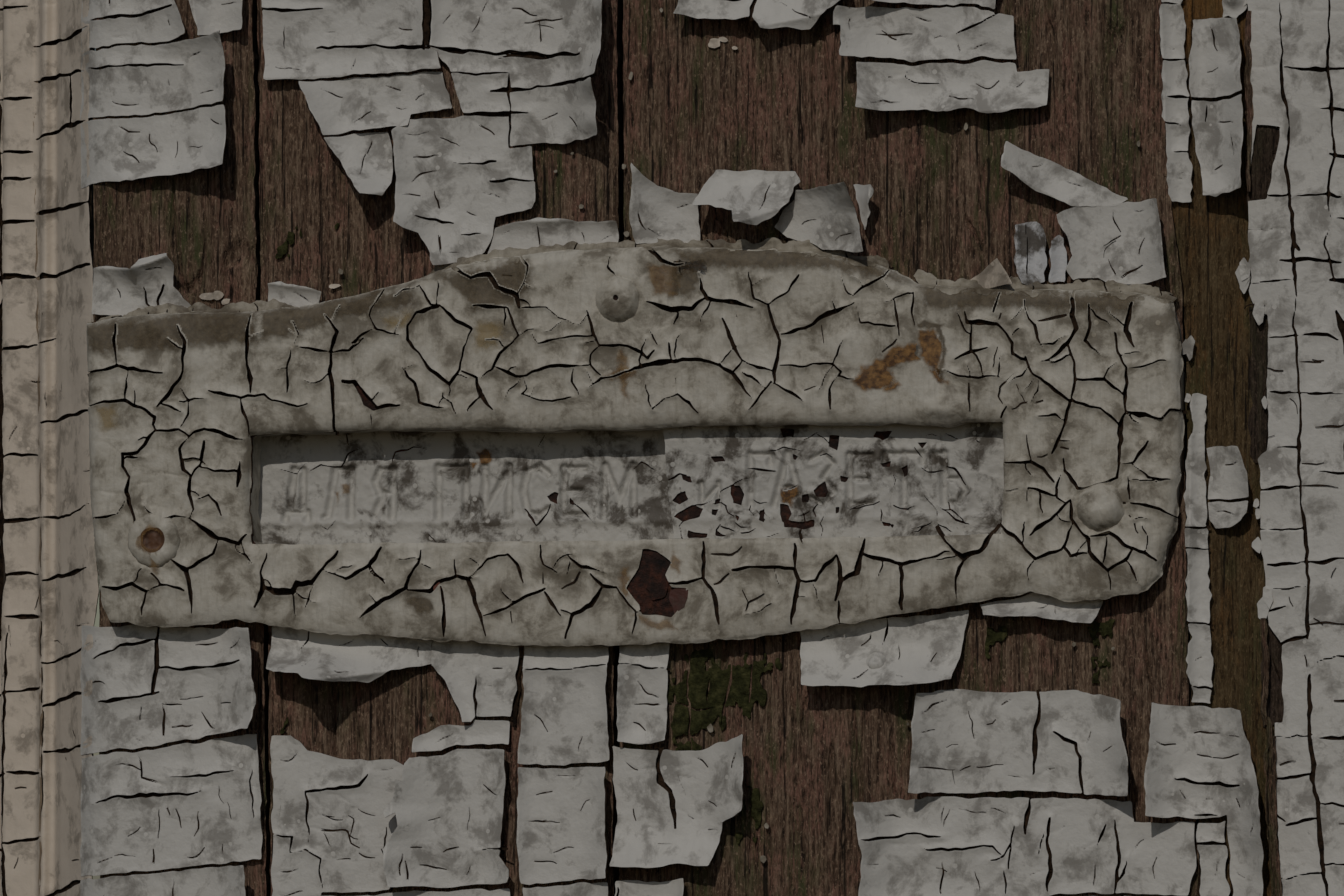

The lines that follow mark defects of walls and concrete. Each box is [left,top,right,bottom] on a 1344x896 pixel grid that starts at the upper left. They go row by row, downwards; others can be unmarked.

peeling [80,0,243,189]
peeling [261,0,874,265]
peeling [674,0,1050,113]
crack [848,12,1001,52]
crack [871,76,1025,103]
peeling [971,0,1280,289]
peeling [92,253,191,316]
rust [854,329,948,390]
peeling [80,625,744,896]
crack [861,689,1157,896]